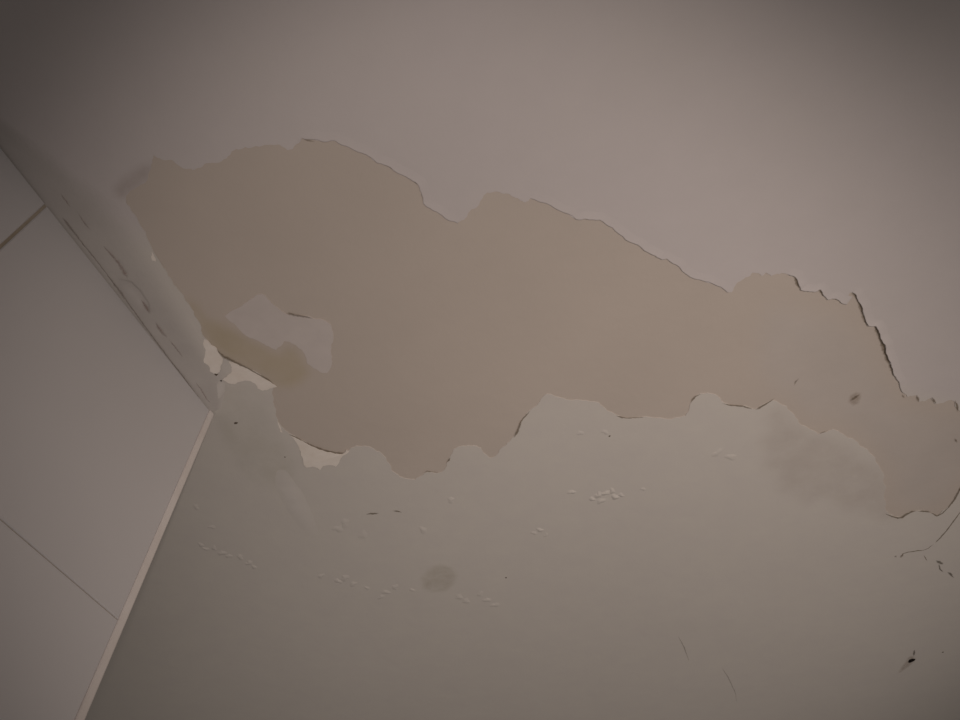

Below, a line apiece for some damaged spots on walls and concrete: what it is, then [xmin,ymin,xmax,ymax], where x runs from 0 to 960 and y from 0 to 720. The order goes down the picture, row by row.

peeling [126,130,960,517]
crack [889,489,960,558]